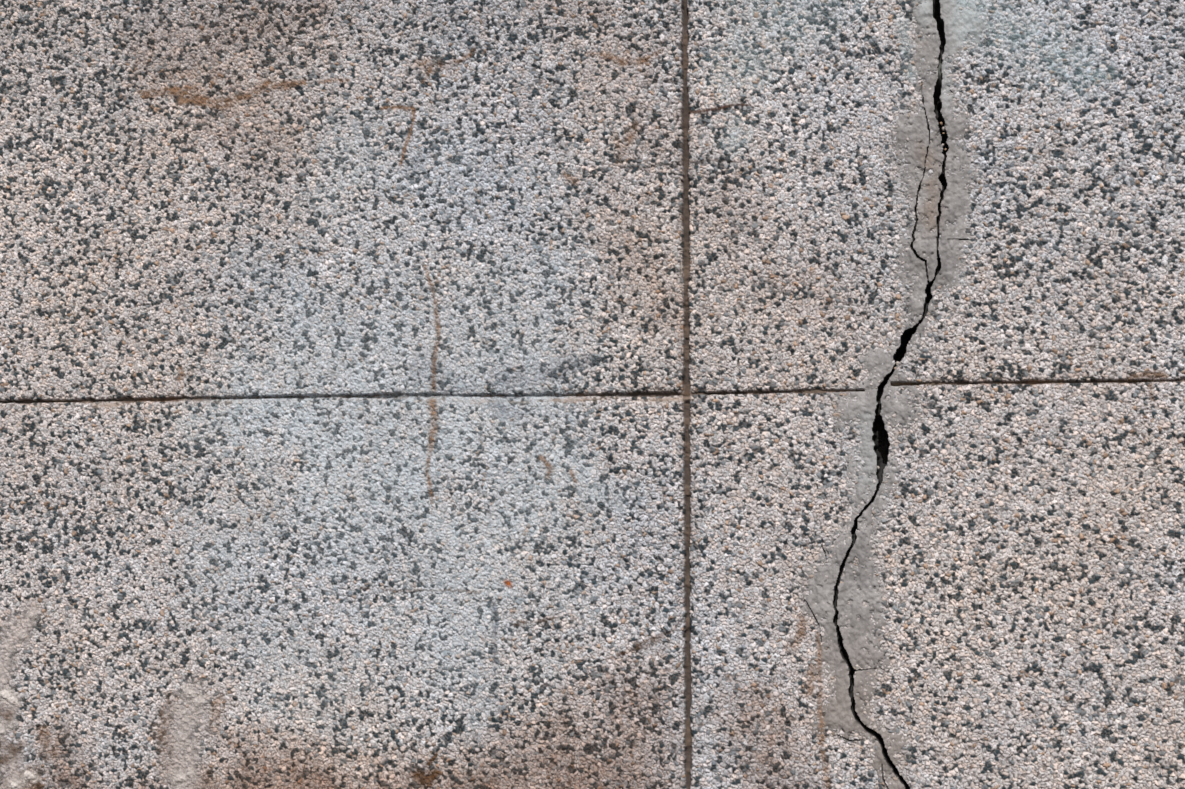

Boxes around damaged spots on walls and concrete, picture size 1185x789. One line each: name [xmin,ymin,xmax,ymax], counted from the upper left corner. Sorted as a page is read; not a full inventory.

rust [168,80,305,107]
crack [804,0,972,789]
water stain [0,605,39,789]